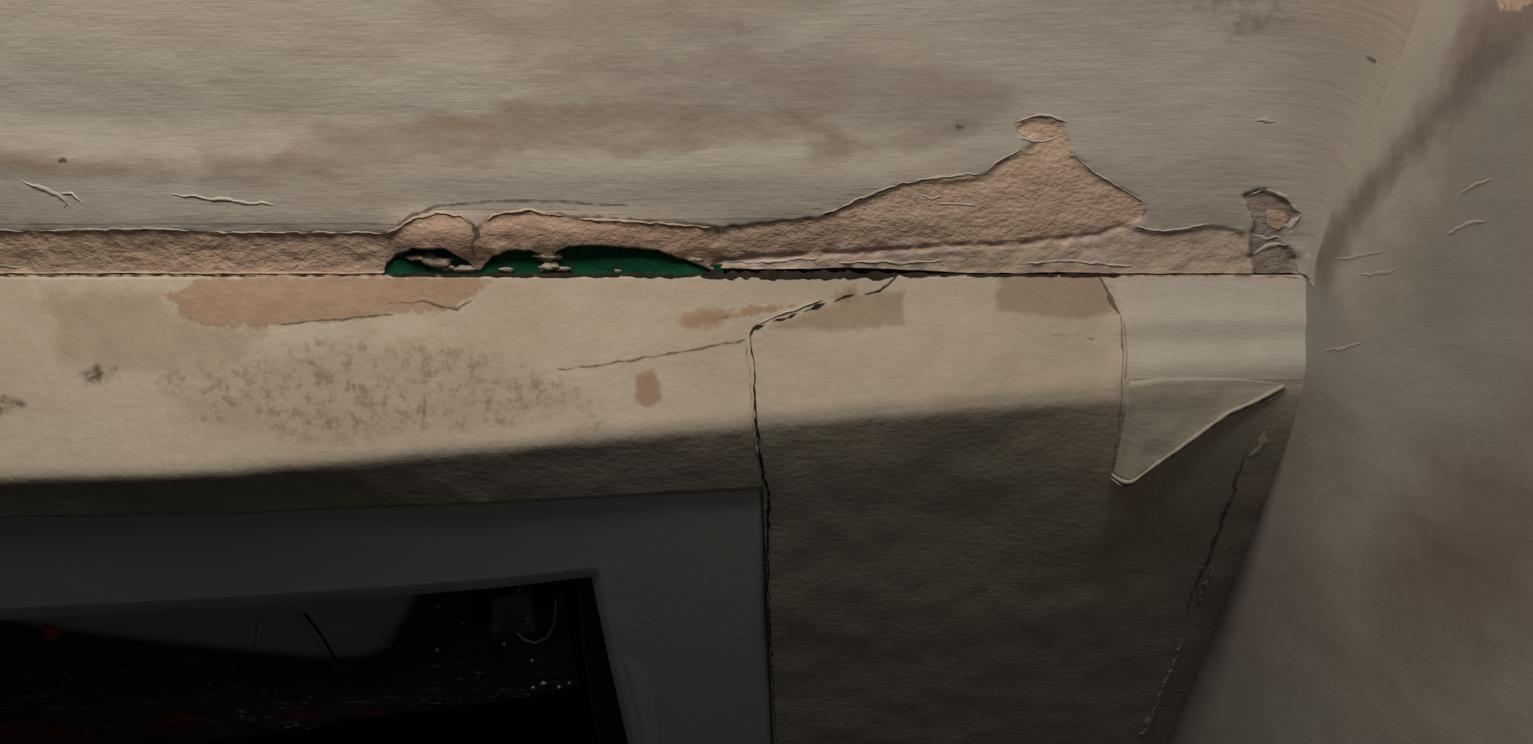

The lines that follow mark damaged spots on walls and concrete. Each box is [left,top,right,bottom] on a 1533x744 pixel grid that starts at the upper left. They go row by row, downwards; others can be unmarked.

flaking render [1492,0,1533,12]
flaking render [0,114,1302,328]
crack [804,185,897,221]
crack [0,199,1293,744]